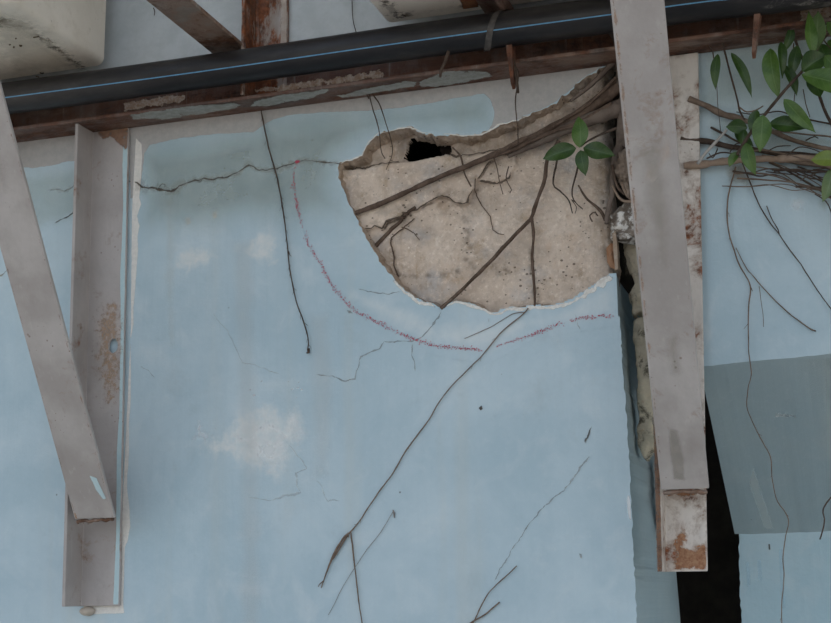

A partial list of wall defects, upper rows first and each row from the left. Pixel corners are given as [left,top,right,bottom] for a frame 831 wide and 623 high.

crack [135,160,339,192]
spalling [129,66,621,315]
corrosion [653,417,697,572]
corrosion [673,533,706,570]